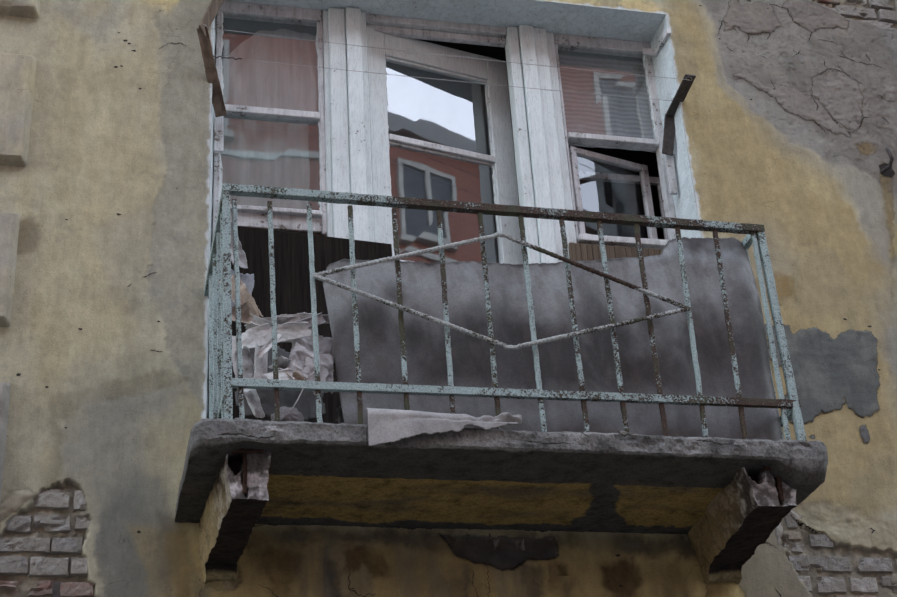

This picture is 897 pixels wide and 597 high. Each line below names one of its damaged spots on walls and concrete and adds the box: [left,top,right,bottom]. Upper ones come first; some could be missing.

flaking render [811,0,897,28]
flaking render [734,68,864,137]
crack [718,2,894,135]
flaking render [879,163,895,177]
flaking render [0,489,94,597]
flaking render [440,535,559,570]
flaking render [783,513,897,597]